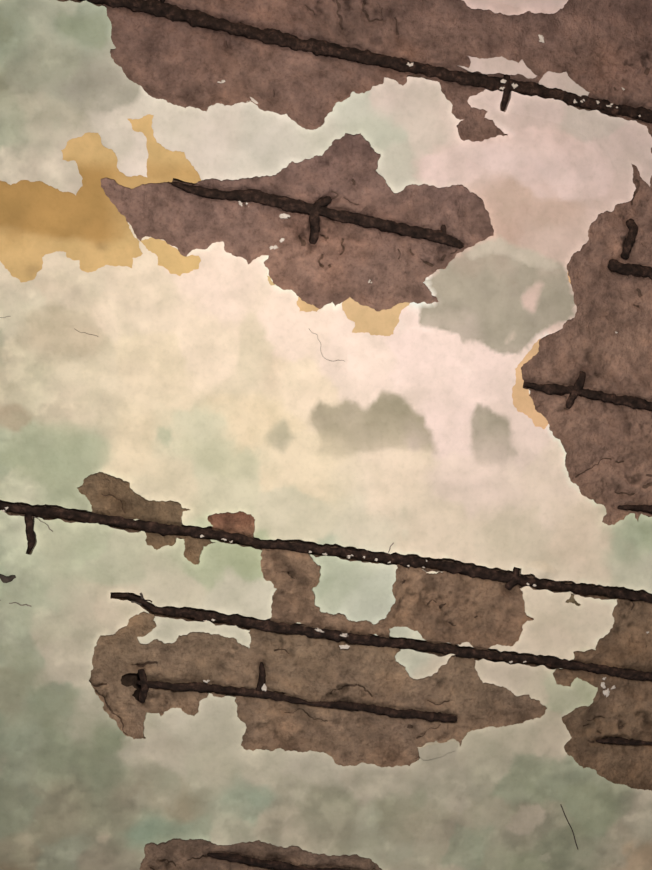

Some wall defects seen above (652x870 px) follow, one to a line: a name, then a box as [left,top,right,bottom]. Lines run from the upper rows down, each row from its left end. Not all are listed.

spalling [103,0,652,142]
spalling [0,114,652,525]
spalling [77,472,215,565]
spalling [207,511,255,539]
spalling [89,540,547,767]
spalling [553,598,652,790]
spalling [140,838,382,870]